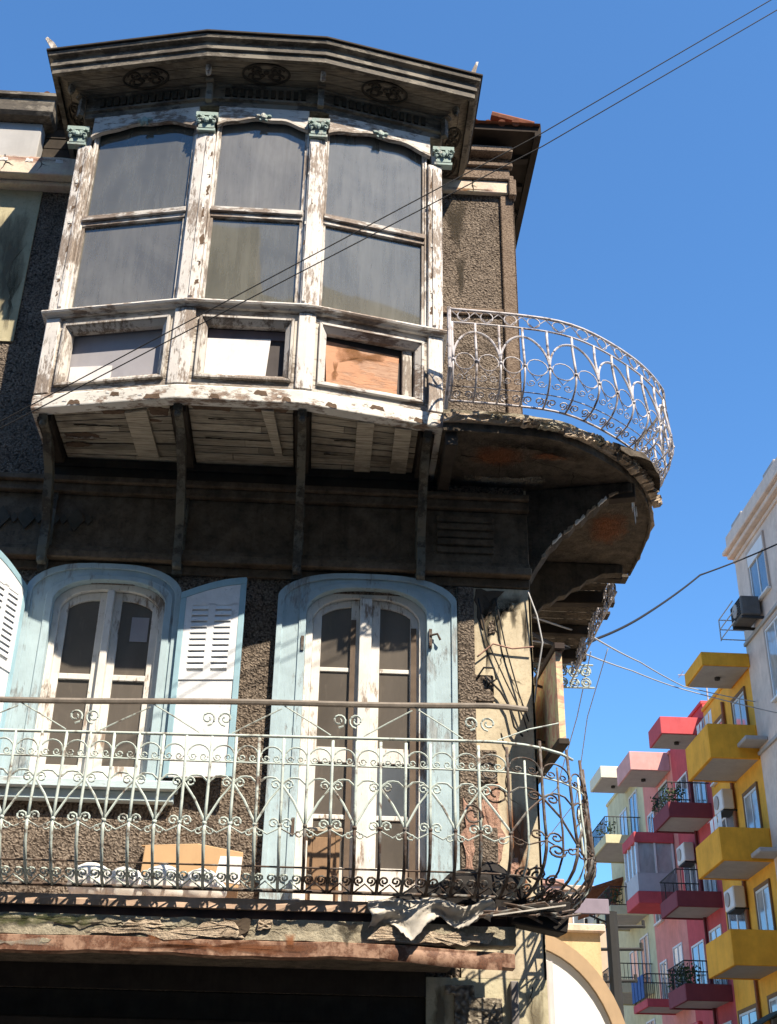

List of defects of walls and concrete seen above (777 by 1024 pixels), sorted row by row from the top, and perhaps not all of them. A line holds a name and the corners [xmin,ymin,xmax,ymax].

peeling [138,393,169,422]
peeling [191,391,232,412]
peeling [248,388,291,413]
spalling [489,413,663,508]
spalling [84,917,273,941]
spalling [368,926,495,947]